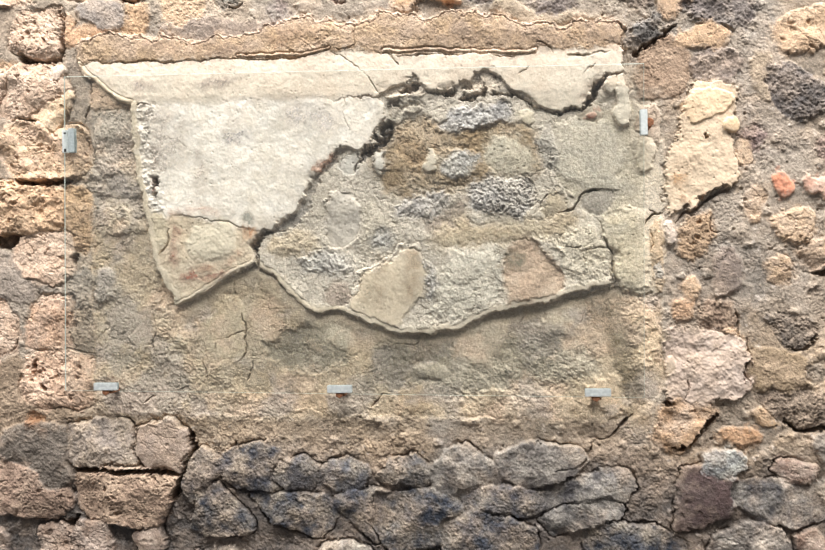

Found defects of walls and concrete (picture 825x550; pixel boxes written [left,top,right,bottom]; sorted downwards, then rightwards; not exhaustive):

crack [59,24,617,268]
spalling [256,69,631,330]
flaking render [636,136,657,173]
crack [179,281,259,398]
crack [565,296,586,324]
crack [566,220,634,306]